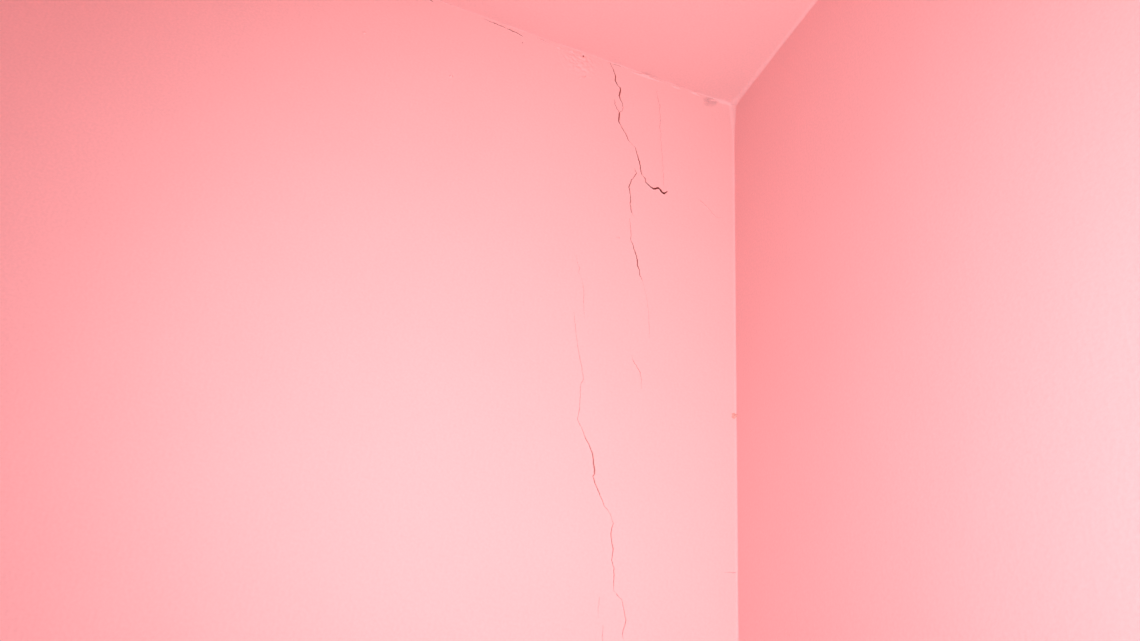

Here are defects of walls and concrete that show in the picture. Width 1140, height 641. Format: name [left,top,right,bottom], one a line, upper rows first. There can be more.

crack [608,61,668,389]
crack [573,254,627,641]